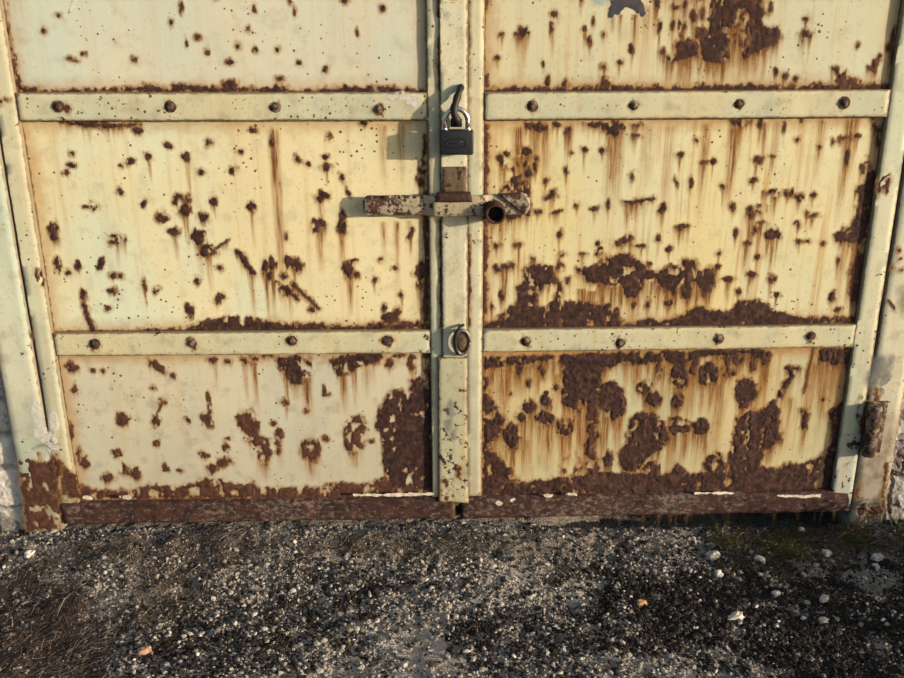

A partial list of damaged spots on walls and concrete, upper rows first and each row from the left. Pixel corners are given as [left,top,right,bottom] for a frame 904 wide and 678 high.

rust [5,3,22,88]
rust [659,0,783,78]
rust [415,133,429,195]
rust [871,117,883,148]
rust [46,221,60,244]
rust [108,234,127,247]
rust [171,193,217,265]
rust [235,129,321,311]
rust [311,189,359,302]
rust [414,215,430,323]
rust [481,119,876,495]
rust [18,300,462,532]